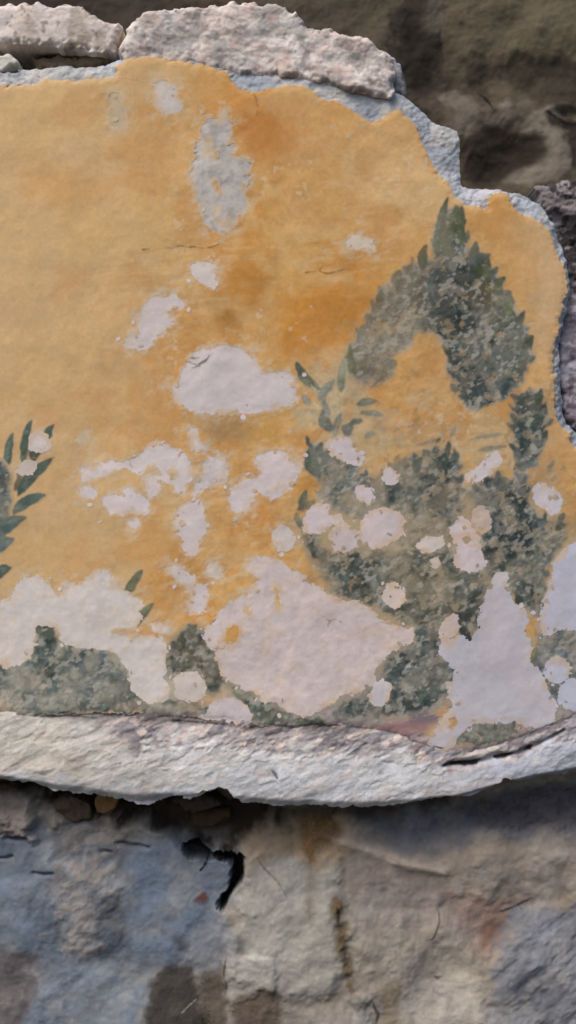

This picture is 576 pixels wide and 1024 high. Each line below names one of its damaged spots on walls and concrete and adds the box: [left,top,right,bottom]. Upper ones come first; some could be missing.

flaking render [189,110,252,233]
flaking render [116,292,191,351]
flaking render [172,344,307,420]
flaking render [0,427,576,753]
crack [443,723,554,766]
crack [184,837,243,908]